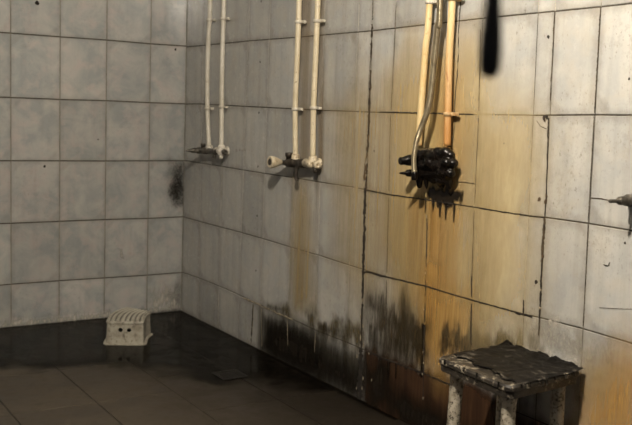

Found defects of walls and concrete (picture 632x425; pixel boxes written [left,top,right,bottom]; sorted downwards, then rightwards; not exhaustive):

crack [548,12,556,97]
leakage [170,166,183,200]
leakage [308,314,361,347]
crack [356,2,387,401]
leakage [369,293,426,377]
rust [393,58,469,359]
rust [477,88,525,317]
crack [515,114,549,335]